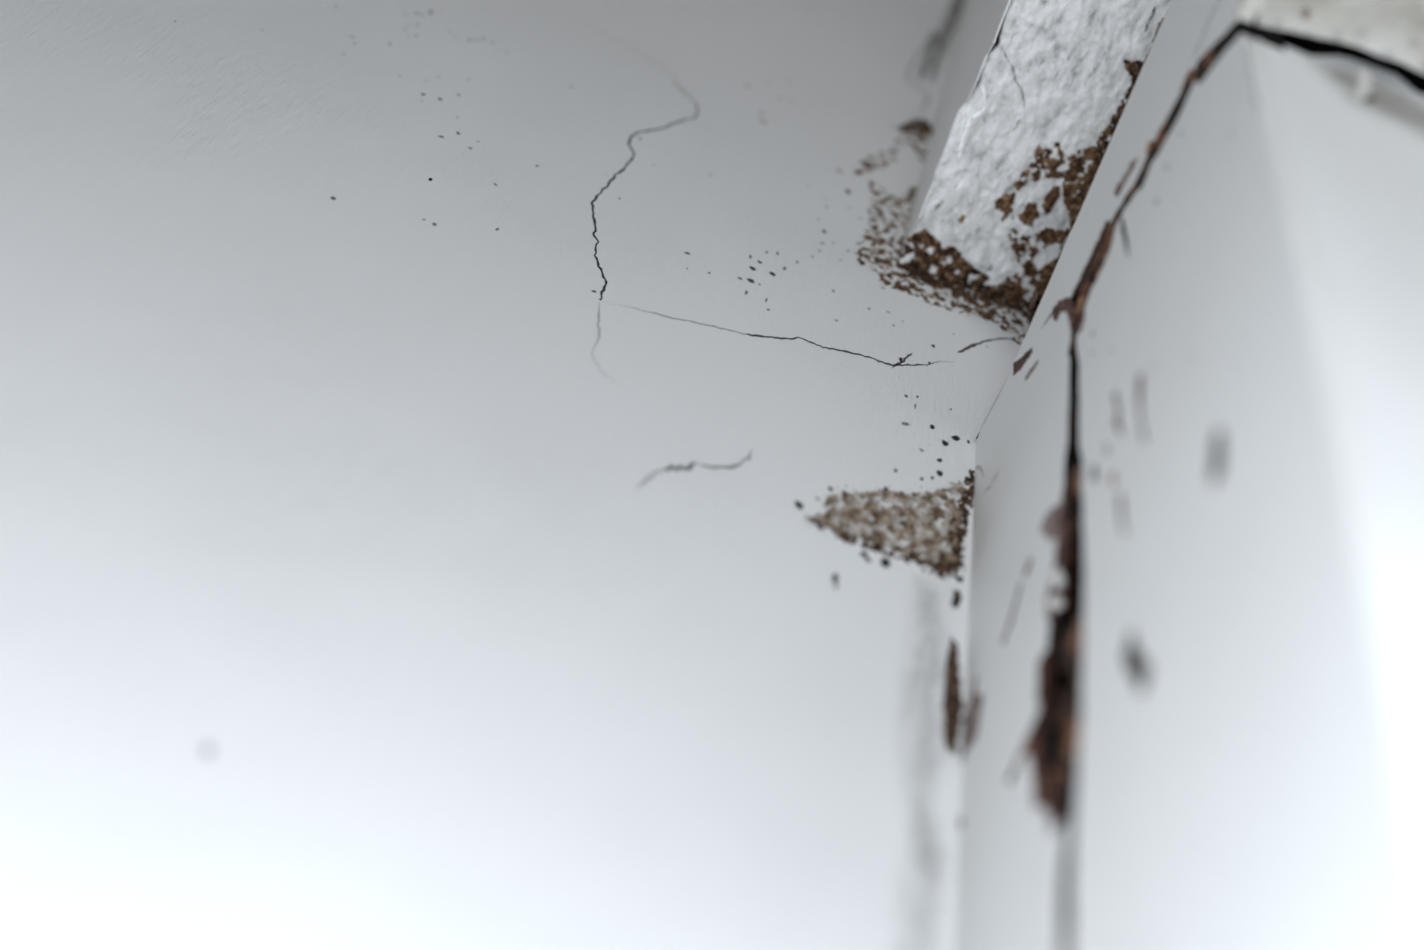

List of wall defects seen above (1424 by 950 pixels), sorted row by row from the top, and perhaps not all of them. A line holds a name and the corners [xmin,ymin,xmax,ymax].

crack [591,105,699,300]
peeling [957,73,987,163]
crack [1000,45,1064,131]
flaking render [1089,18,1164,168]
peeling [1114,156,1140,197]
crack [1028,13,1424,333]
crack [747,333,1015,368]
flaking render [817,206,1039,381]
crack [1072,378,1080,432]
flaking render [805,425,975,582]
crack [1007,467,1084,836]